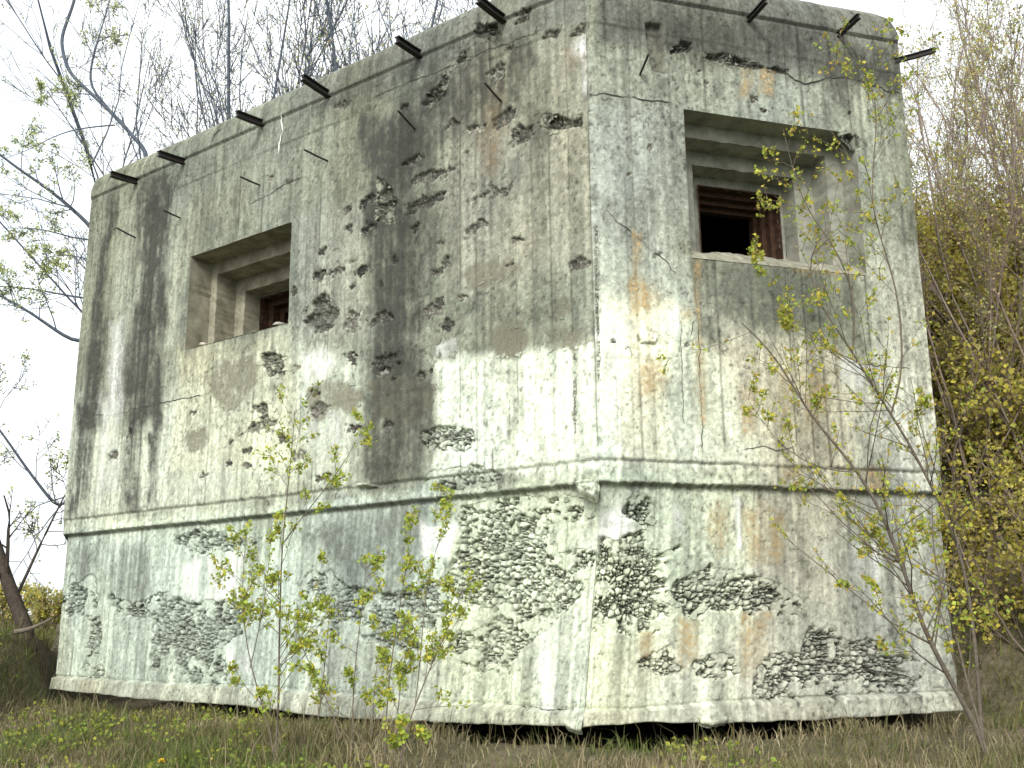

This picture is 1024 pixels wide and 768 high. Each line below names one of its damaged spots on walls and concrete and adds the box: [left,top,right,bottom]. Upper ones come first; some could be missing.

spalling [447,107,587,148]
crack [591,92,667,102]
spalling [665,40,790,85]
spalling [343,154,456,237]
leakage [359,47,533,482]
leakage [69,171,172,514]
spalling [545,226,629,444]
crack [612,215,704,449]
spalling [173,528,259,556]
spalling [301,425,810,682]
spalling [62,573,252,689]
spalling [752,626,924,704]